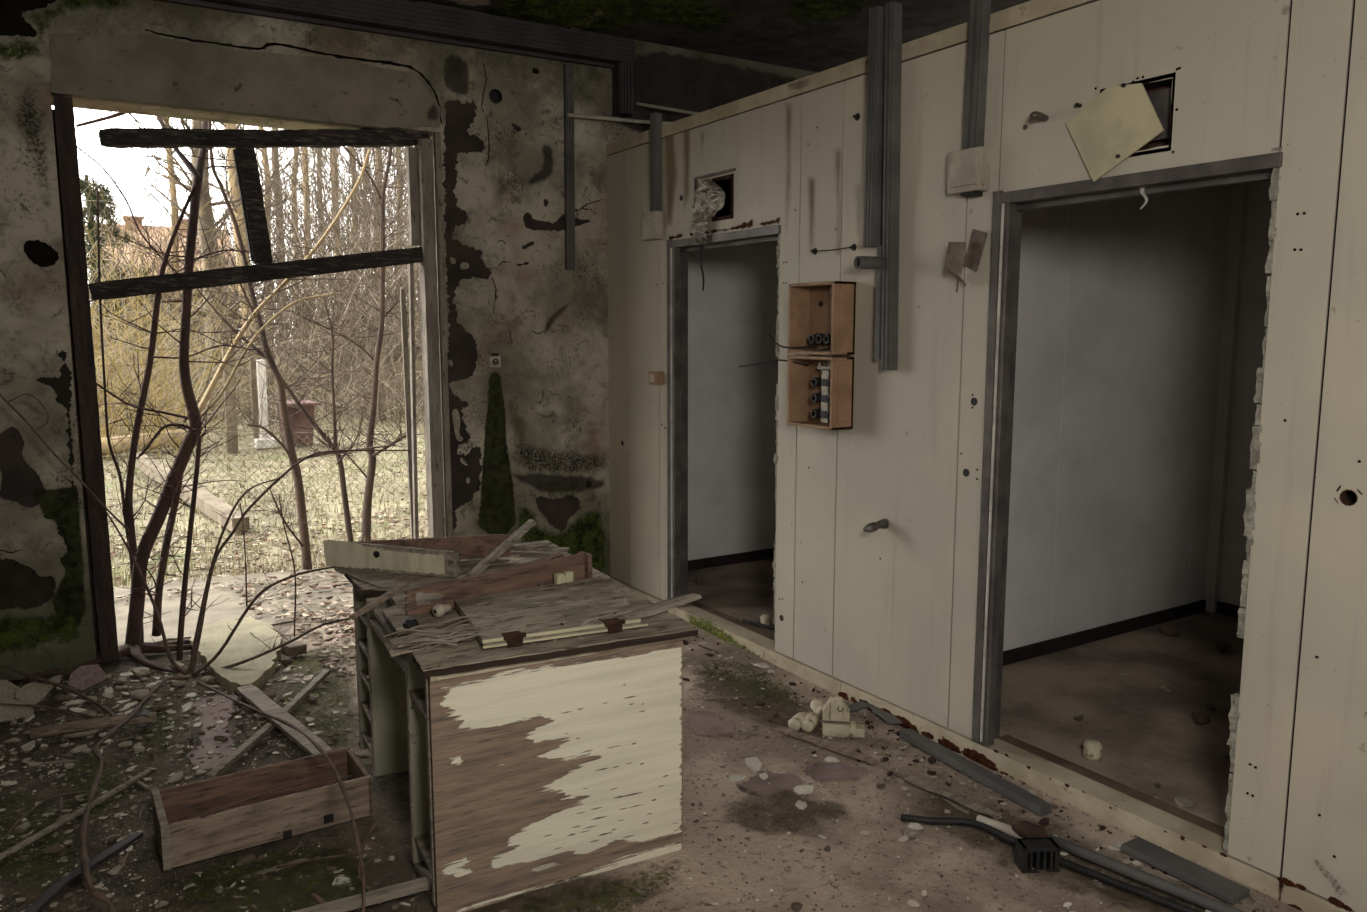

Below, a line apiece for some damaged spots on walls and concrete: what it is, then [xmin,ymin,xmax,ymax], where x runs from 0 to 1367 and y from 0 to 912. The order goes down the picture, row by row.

flaking render [0,0,56,37]
crack [145,29,442,124]
crack [481,64,490,166]
flaking render [517,199,590,267]
peeling [442,98,492,533]
flaking render [35,350,78,493]
flaking render [0,426,83,610]
rust [838,692,1031,784]
rust [1277,877,1306,911]
rust [1328,896,1353,912]